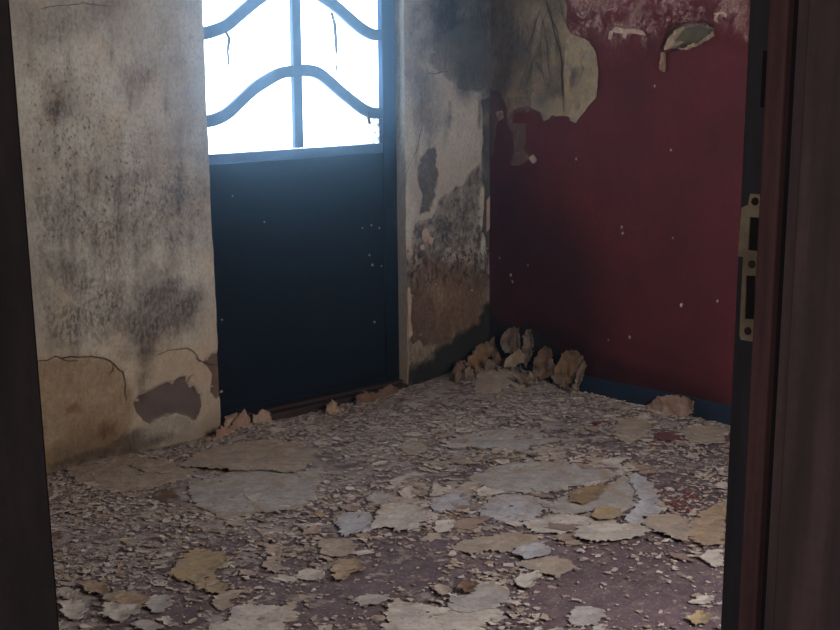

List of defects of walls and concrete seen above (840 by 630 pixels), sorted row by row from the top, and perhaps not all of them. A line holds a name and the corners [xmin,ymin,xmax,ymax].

spalling [659,21,714,72]
leakage [128,280,196,351]
peeling [408,286,422,346]
leakage [407,247,561,386]
crack [39,356,127,400]
spalling [134,376,201,424]
crack [158,347,219,382]
spalling [204,353,223,398]